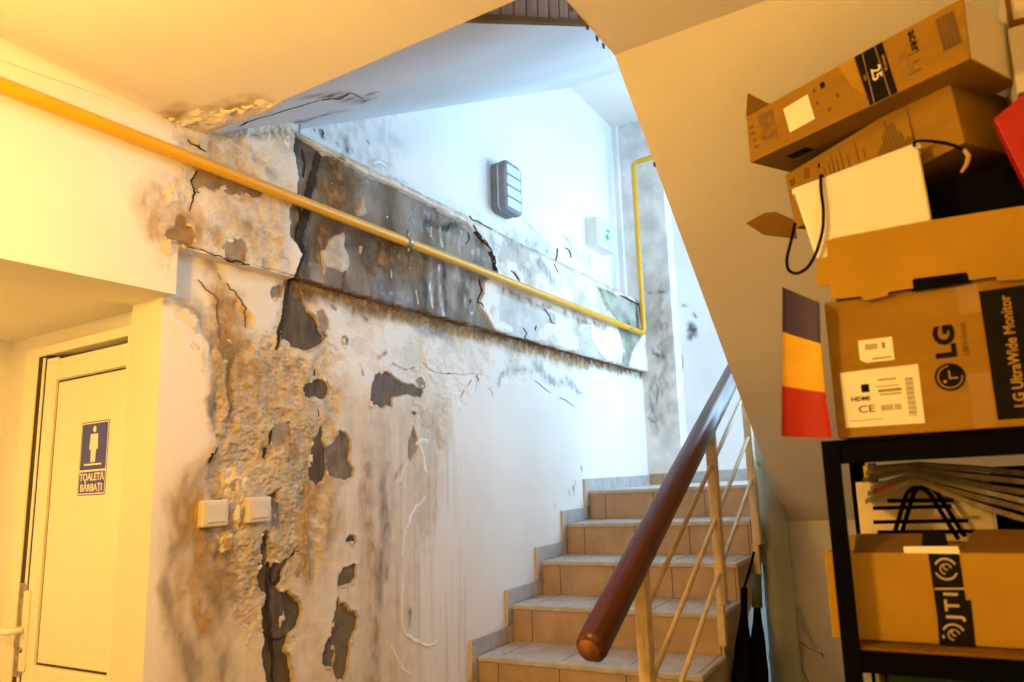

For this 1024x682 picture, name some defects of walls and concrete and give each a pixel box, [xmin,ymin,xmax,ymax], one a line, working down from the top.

crack [188,140,206,211]
crack [240,92,363,350]
spalling [270,137,555,353]
crack [198,249,250,343]
spalling [303,377,328,399]
spalling [369,369,426,408]
peeling [576,328,606,361]
spalling [597,287,644,368]
spalling [307,427,352,485]
spalling [257,492,303,682]
crack [262,546,300,682]
spalling [322,536,358,682]